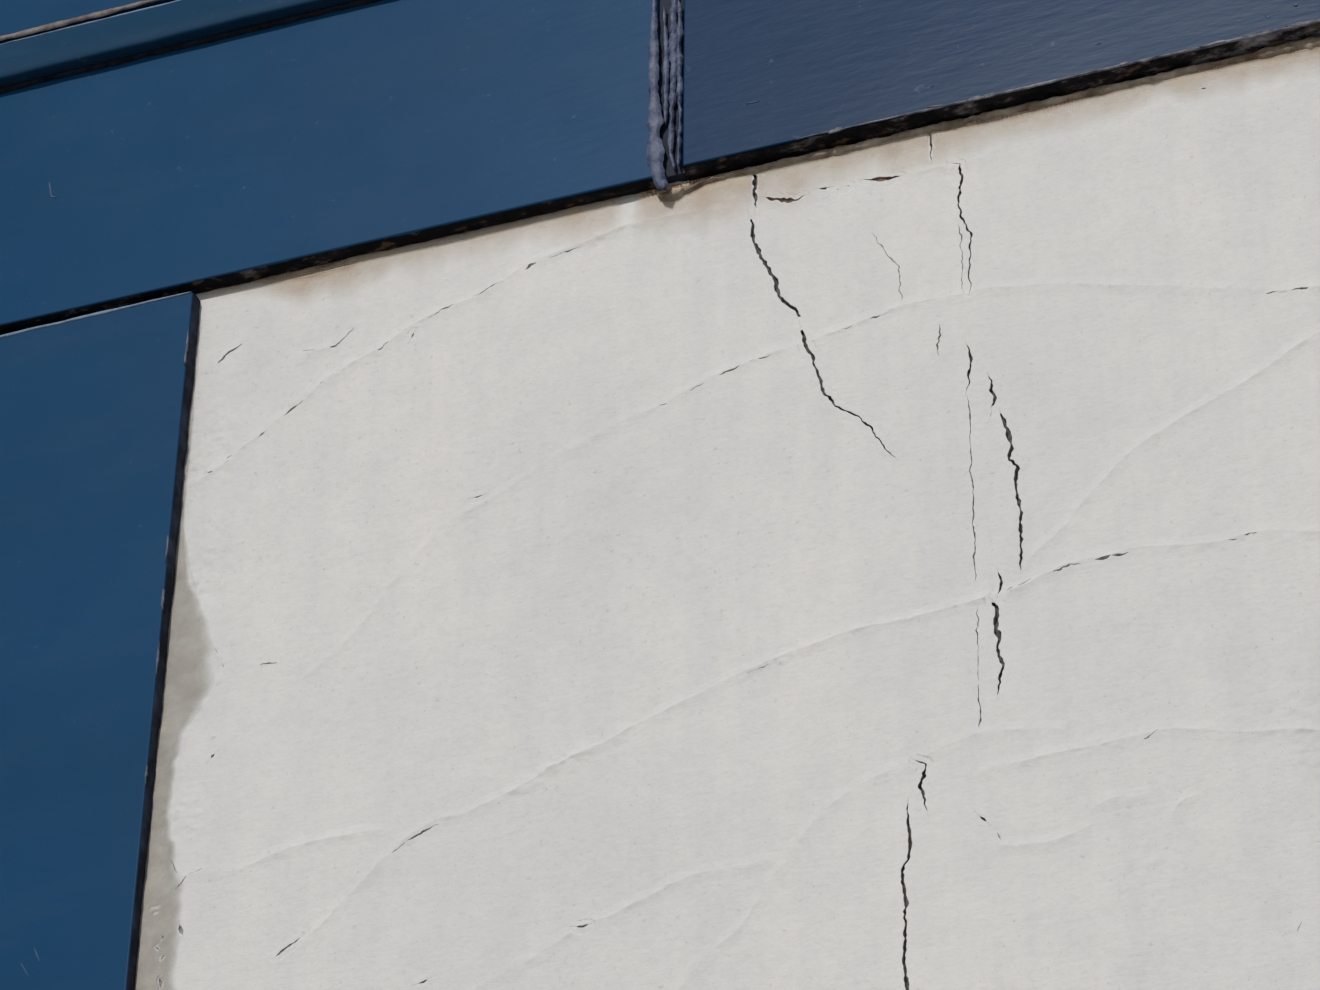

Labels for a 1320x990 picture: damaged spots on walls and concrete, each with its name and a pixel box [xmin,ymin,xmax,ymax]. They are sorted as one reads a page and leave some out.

crack [692,165,905,466]
crack [923,133,980,296]
crack [893,752,935,990]
crack [970,807,1001,839]